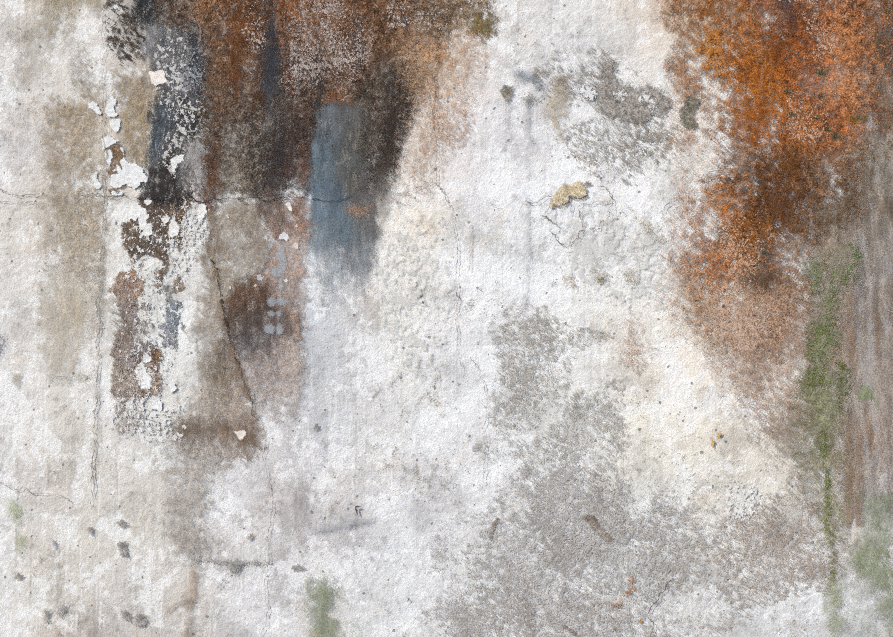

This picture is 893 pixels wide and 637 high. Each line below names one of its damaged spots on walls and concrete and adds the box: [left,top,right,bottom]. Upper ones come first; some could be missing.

peeling [54,0,140,60]
flaking render [39,60,274,469]
crack [0,13,351,509]
water stain [223,99,389,420]
corrosion [150,0,497,209]
crack [528,169,625,247]
spalling [499,47,699,218]
corrosion [638,0,893,505]
water stain [803,0,893,527]
peeling [411,302,856,637]